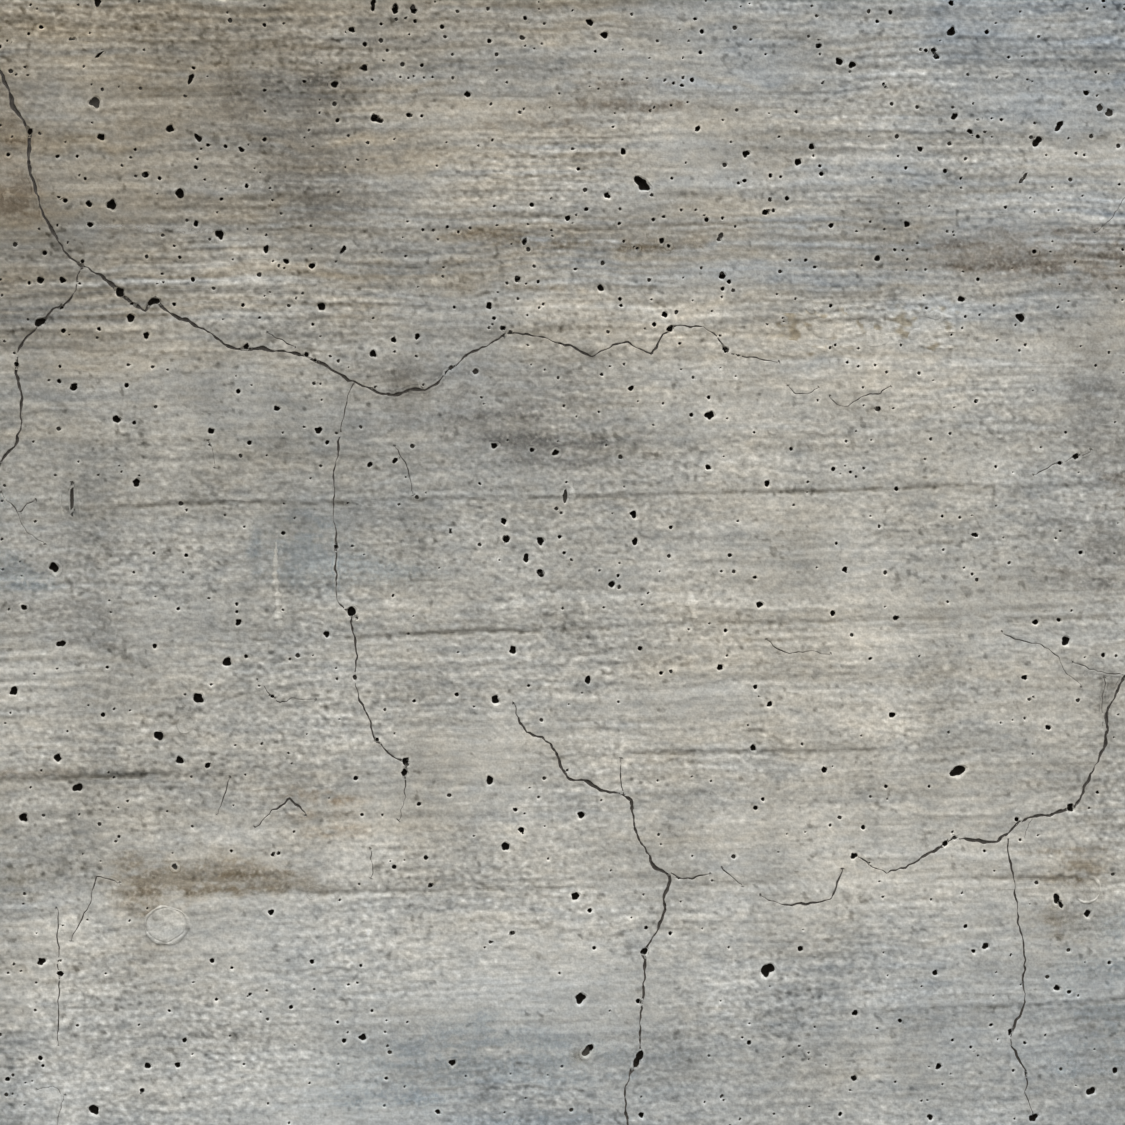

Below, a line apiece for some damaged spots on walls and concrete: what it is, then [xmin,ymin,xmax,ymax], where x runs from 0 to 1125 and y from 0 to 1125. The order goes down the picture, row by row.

crack [0,58,892,822]
crack [255,794,309,830]
crack [53,873,119,1045]
crack [37,1083,67,1125]